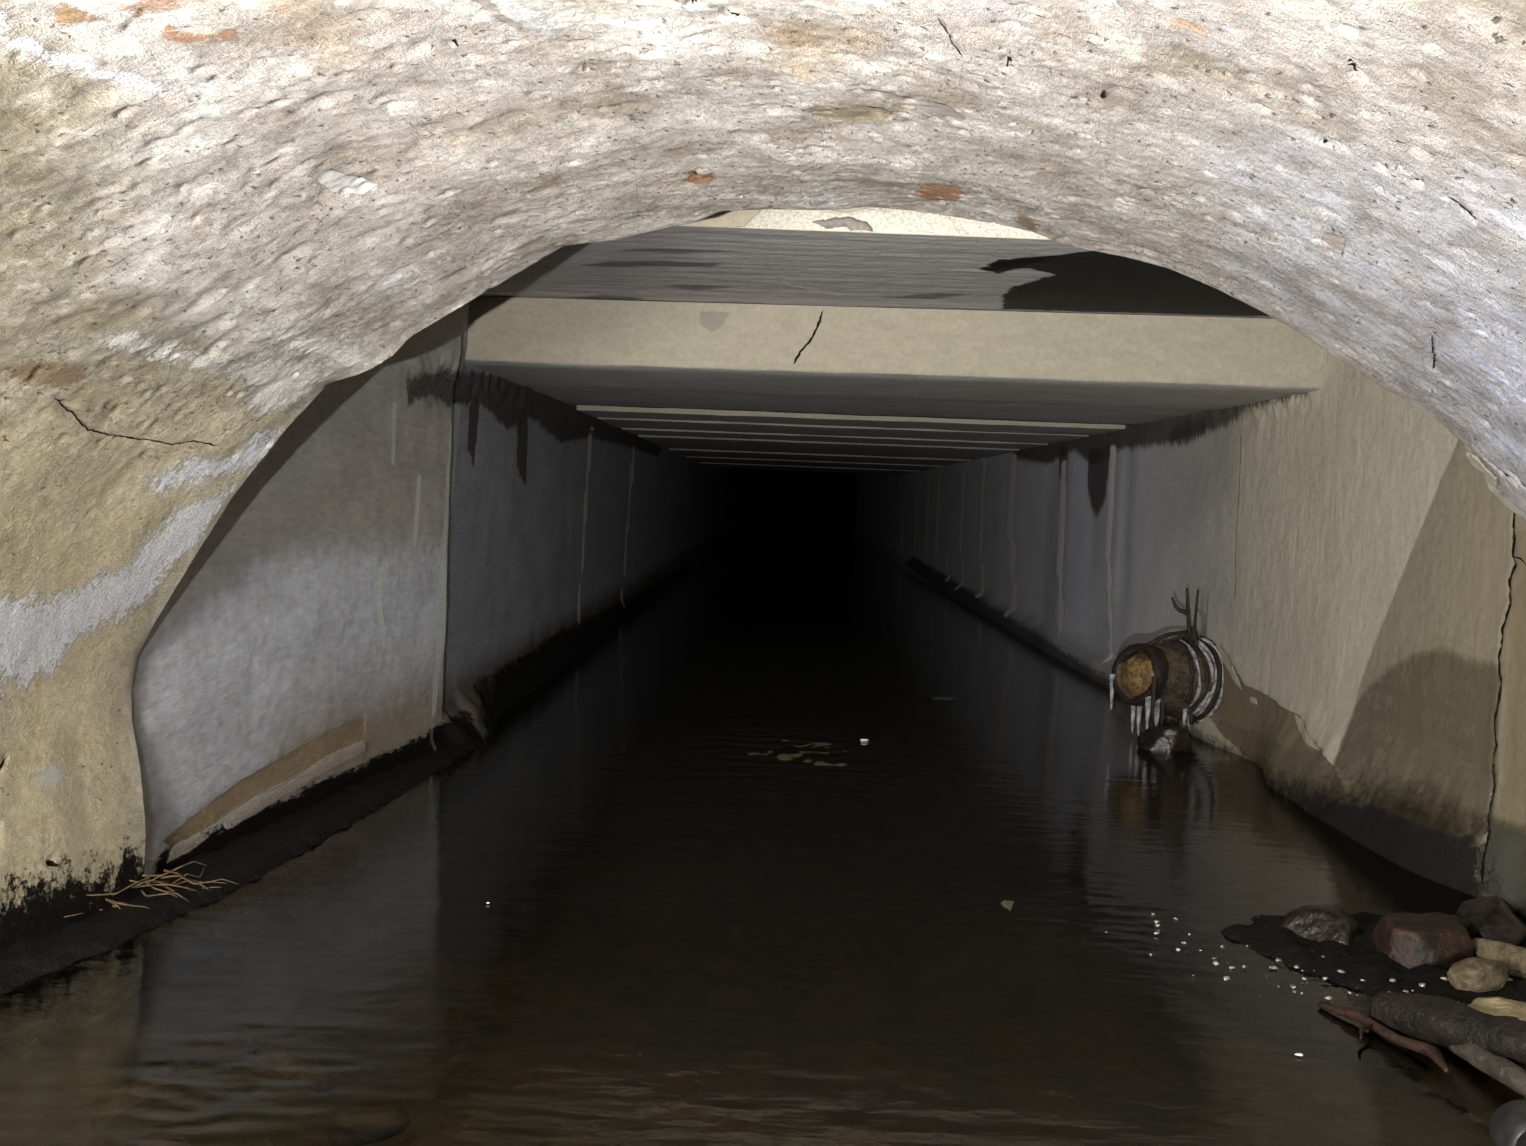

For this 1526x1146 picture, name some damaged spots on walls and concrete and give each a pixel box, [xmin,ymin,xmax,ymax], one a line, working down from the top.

corrosion [50,4,105,25]
corrosion [128,0,238,42]
water stain [0,11,175,96]
crack [794,311,823,363]
crack [55,397,216,446]
water stain [0,317,693,950]
crack [1465,451,1526,923]